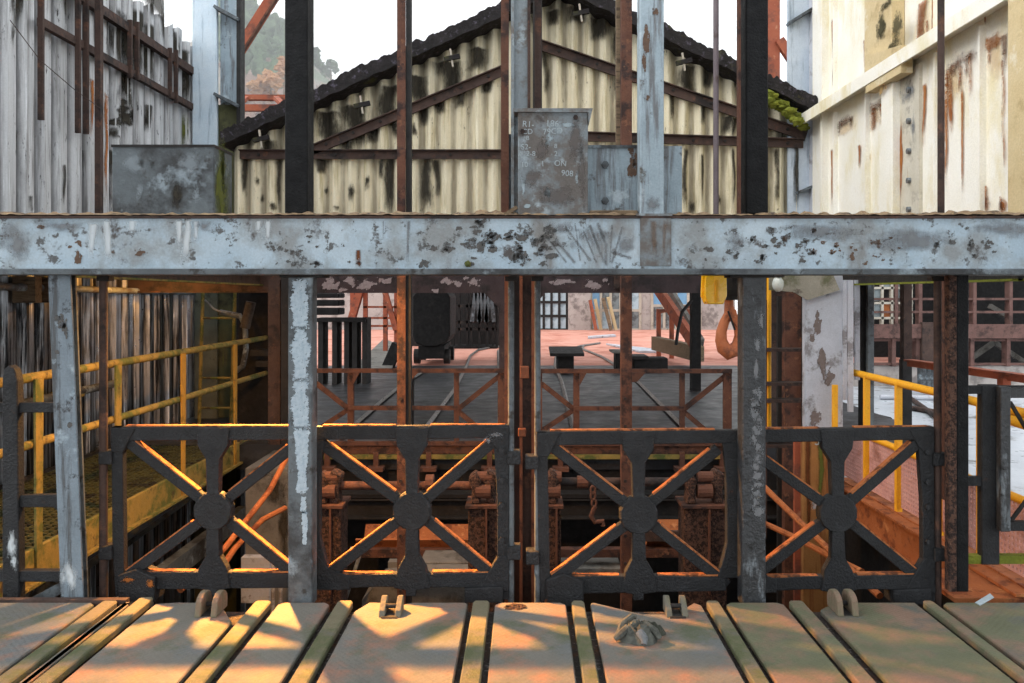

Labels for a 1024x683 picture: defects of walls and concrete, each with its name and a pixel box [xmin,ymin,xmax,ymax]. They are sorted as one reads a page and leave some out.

leakage [317,85,397,149]
leakage [412,47,486,124]
rust [642,8,659,72]
leakage [876,0,903,49]
rust [945,52,973,183]
rust [985,34,1007,107]
leakage [379,159,394,206]
leakage [420,159,440,205]
peeling [416,218,562,293]
peeling [703,226,901,265]
peeling [810,310,835,386]
peeling [289,279,311,545]